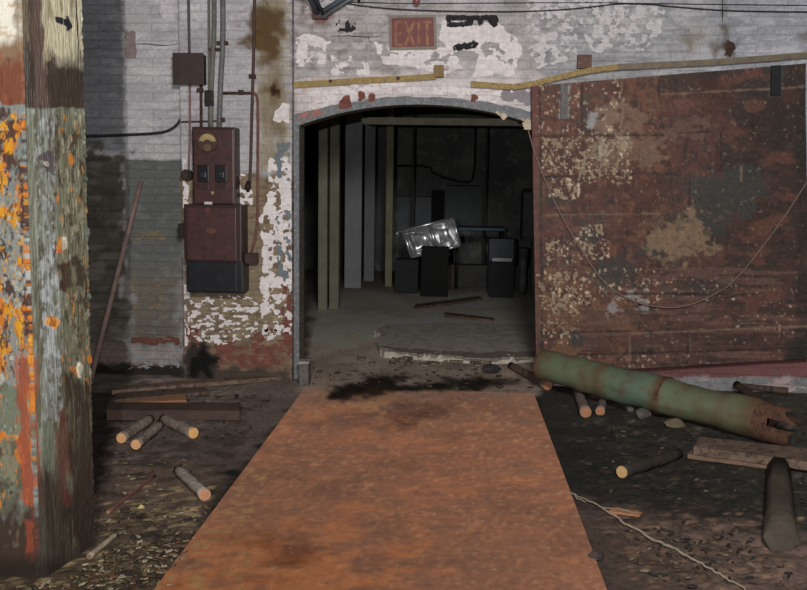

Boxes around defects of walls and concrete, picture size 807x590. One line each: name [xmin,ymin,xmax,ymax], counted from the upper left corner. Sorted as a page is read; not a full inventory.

peeling [336,20,356,33]
peeling [374,0,665,78]
spalling [724,40,736,57]
peeling [273,33,422,123]
peeling [432,85,531,120]
peeling [128,142,293,369]
water stain [329,375,515,400]